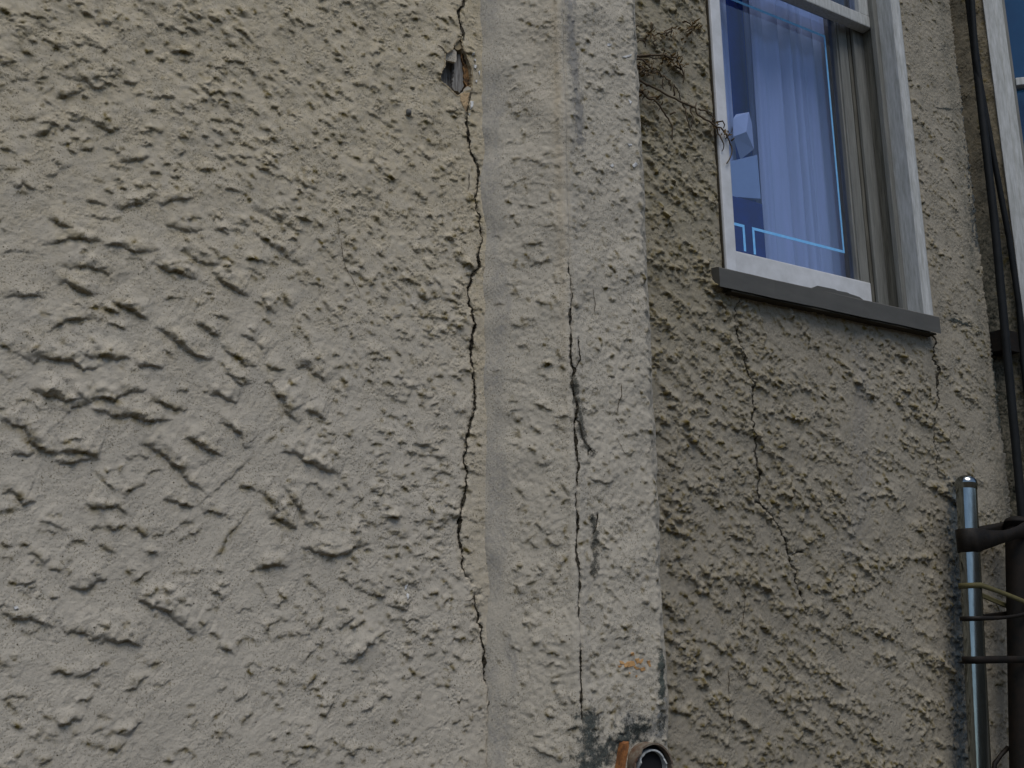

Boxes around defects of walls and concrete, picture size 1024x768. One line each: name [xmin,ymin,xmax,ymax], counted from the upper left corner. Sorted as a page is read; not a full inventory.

crack [438,0,465,53]
spalling [439,37,480,116]
crack [457,94,490,705]
crack [568,266,598,623]
crack [734,301,807,614]
crack [577,648,585,721]